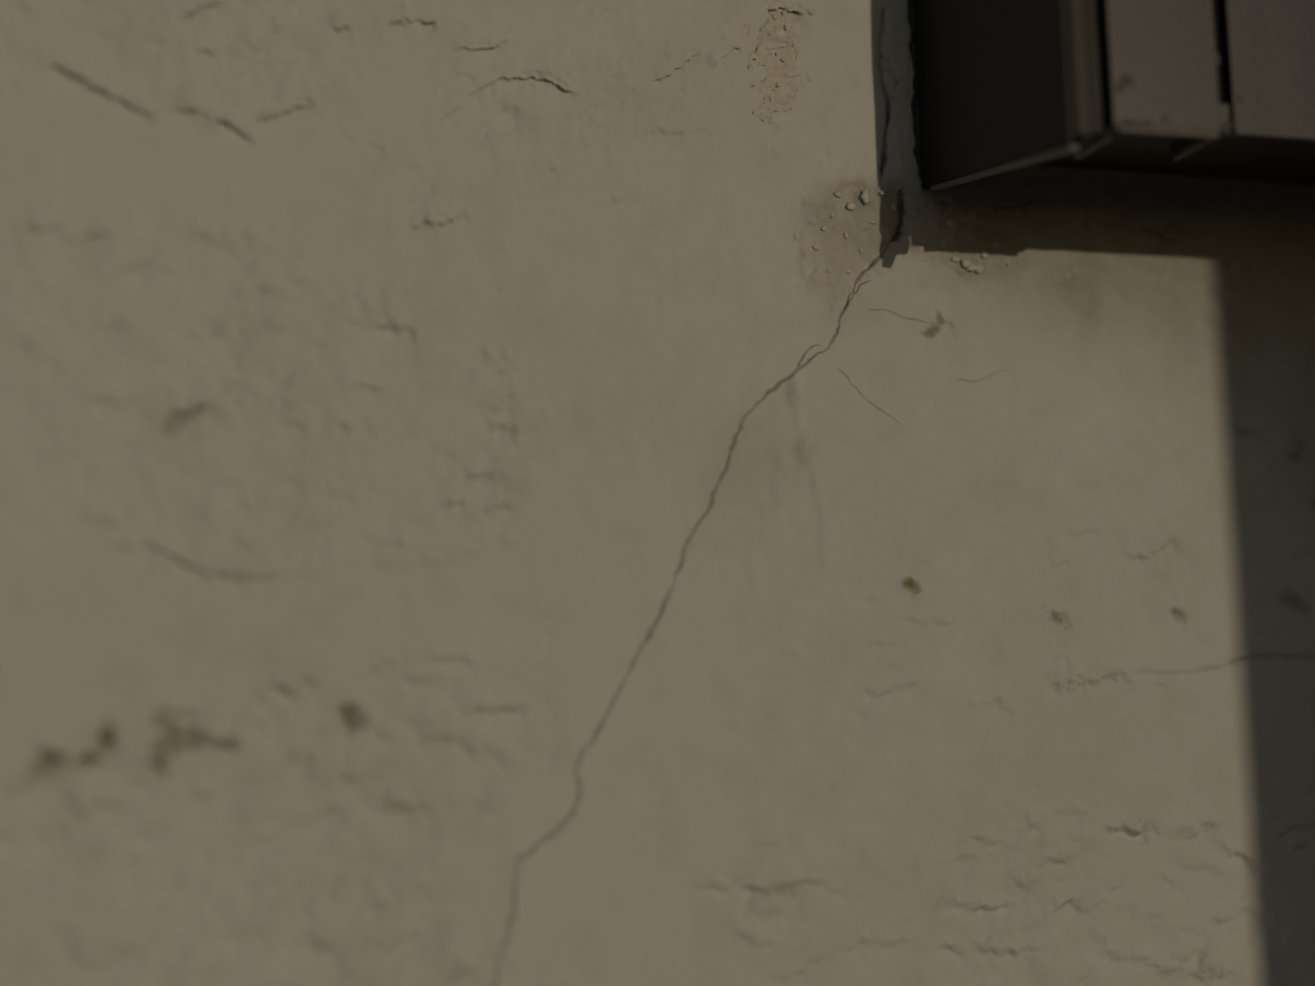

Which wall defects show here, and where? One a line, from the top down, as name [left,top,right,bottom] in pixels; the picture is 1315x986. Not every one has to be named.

crack [871,103,904,267]
flaking render [793,155,1022,336]